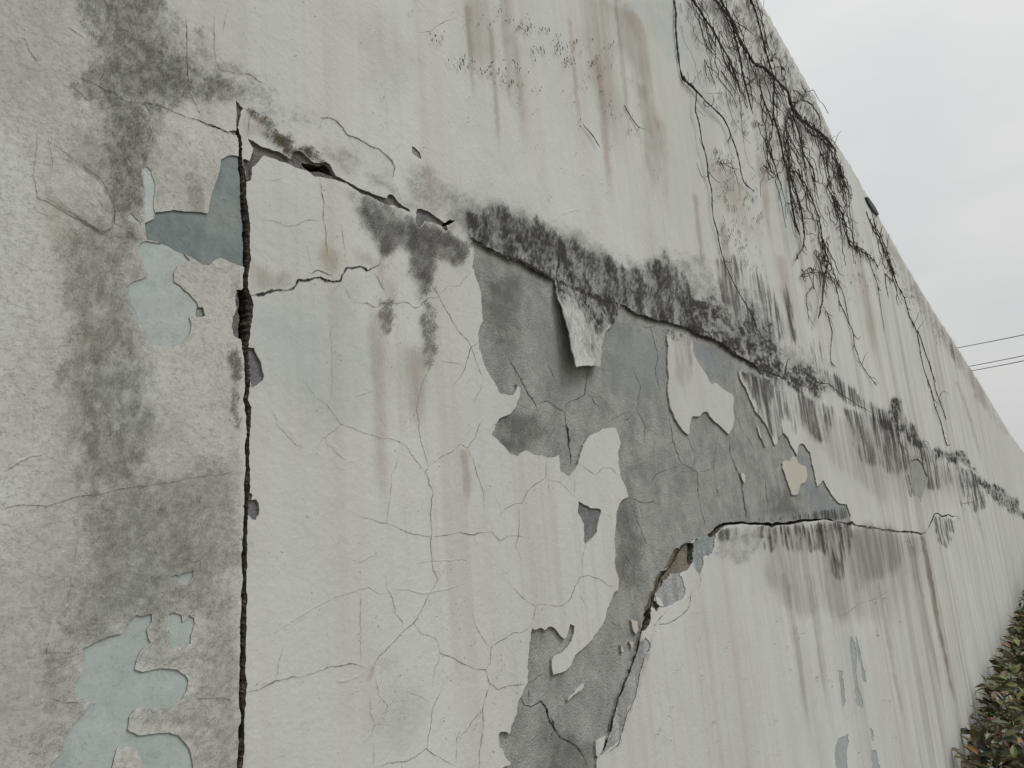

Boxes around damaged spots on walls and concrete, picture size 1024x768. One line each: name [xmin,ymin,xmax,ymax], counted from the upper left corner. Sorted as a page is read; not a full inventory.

damp [73,0,222,210]
peeling [126,139,455,347]
damp [228,349,244,427]
crack [71,65,658,768]
spalling [468,237,851,768]
damp [361,197,1024,519]
crack [509,304,992,755]
damp [760,486,853,578]
peeling [50,612,195,768]
peeling [816,636,875,710]